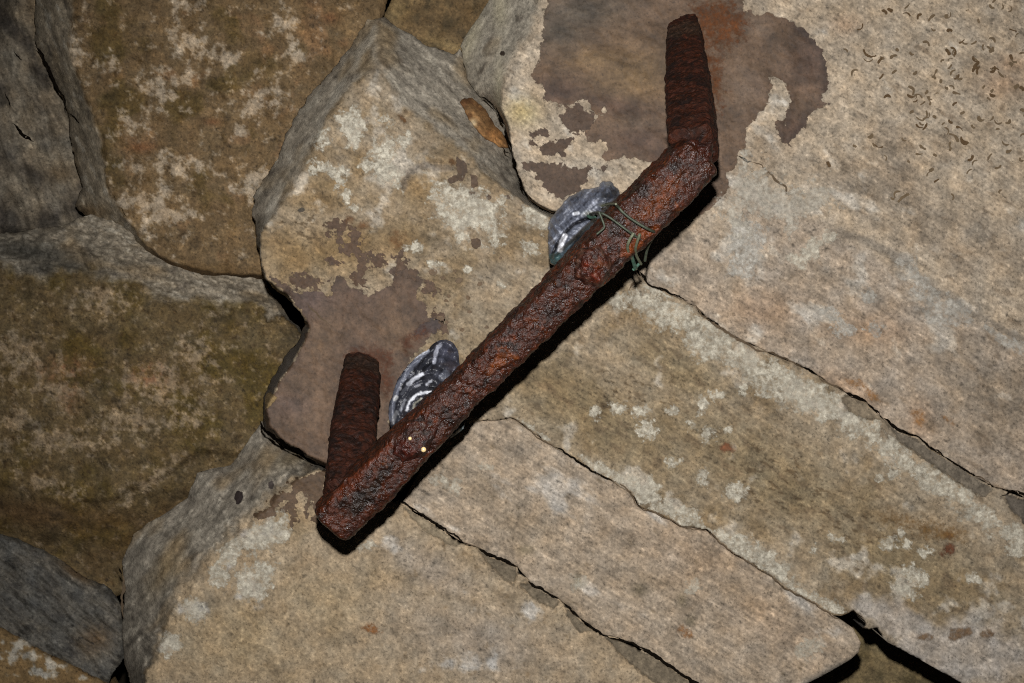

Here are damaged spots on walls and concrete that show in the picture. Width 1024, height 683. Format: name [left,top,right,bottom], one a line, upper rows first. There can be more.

damp [423,157,510,259]
damp [521,0,840,280]
crack [629,272,1024,497]
crack [399,501,699,683]
crack [516,420,839,619]